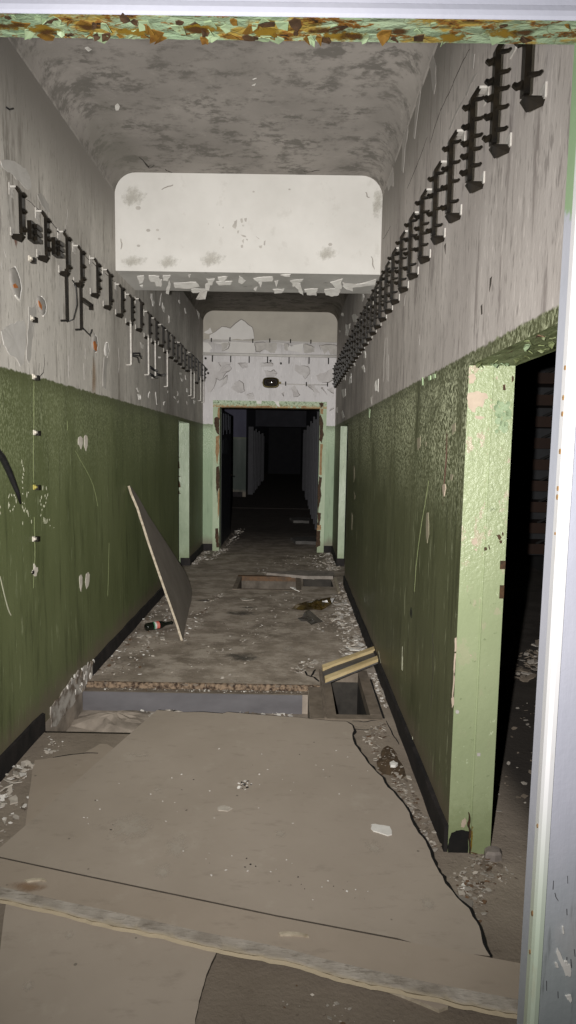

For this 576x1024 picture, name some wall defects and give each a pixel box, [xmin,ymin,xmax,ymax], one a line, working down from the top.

peeling [4,13,348,52]
peeling [361,30,398,46]
peeling [414,22,438,42]
peeling [482,24,508,45]
peeling [137,274,376,327]
peeling [203,319,373,418]
peeling [467,335,556,420]
crack [356,720,399,744]
spalling [348,722,492,958]
crack [465,812,473,854]